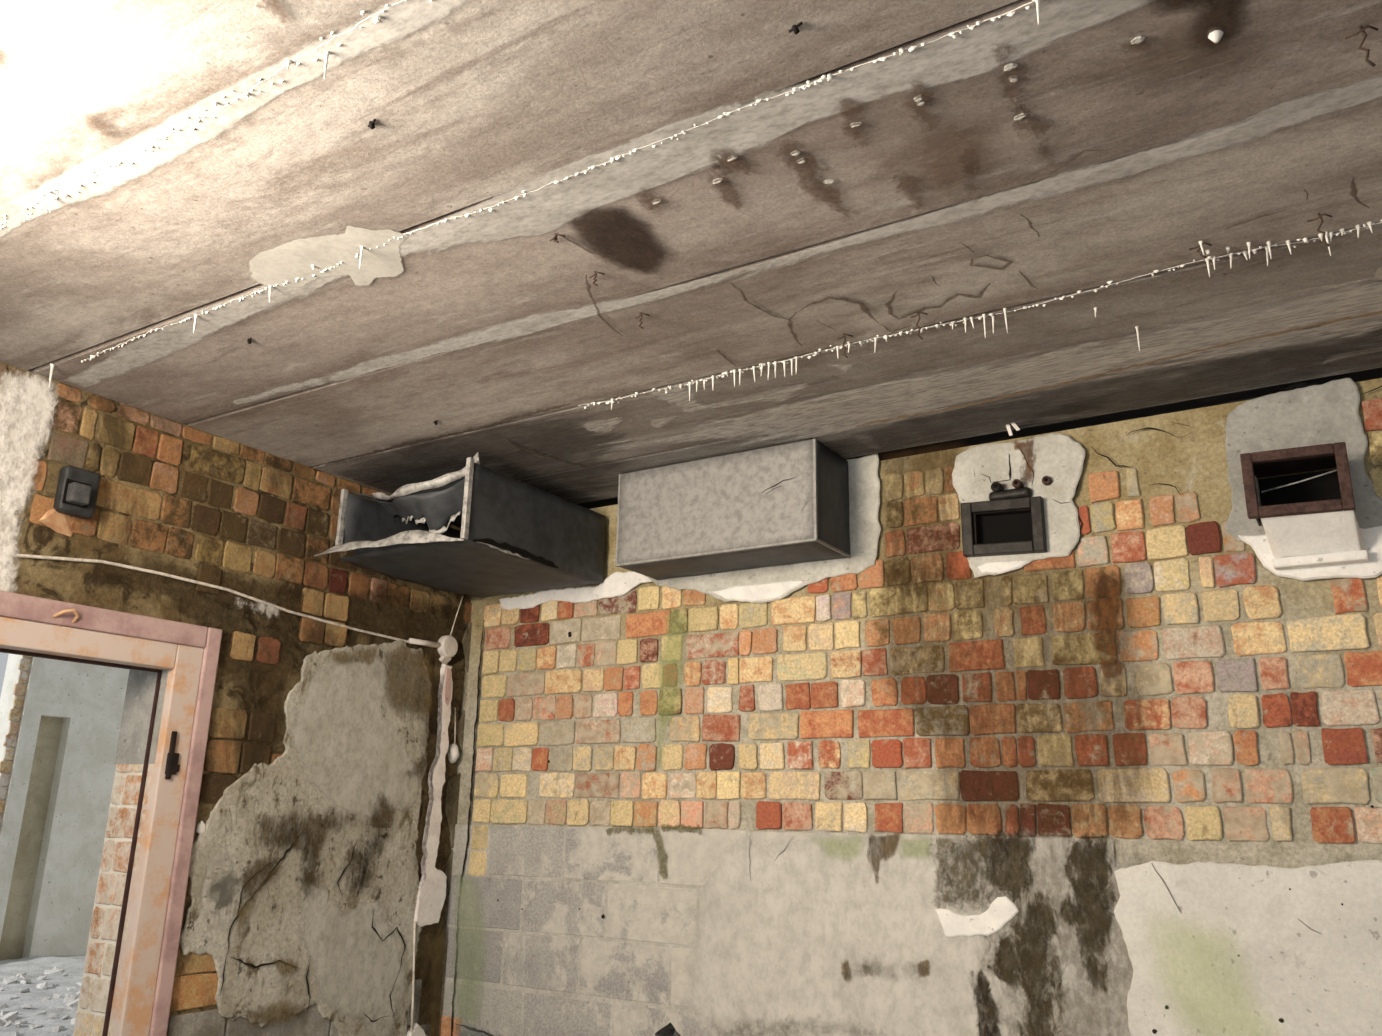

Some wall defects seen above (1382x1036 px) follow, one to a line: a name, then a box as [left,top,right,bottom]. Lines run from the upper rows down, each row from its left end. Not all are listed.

leakage [0,0,407,229]
leakage [81,0,1040,363]
crack [564,237,623,336]
leakage [340,220,1382,504]
crack [730,243,1038,346]
leakage [1152,0,1242,50]
leakage [96,559,467,1036]
leakage [936,830,1116,1036]